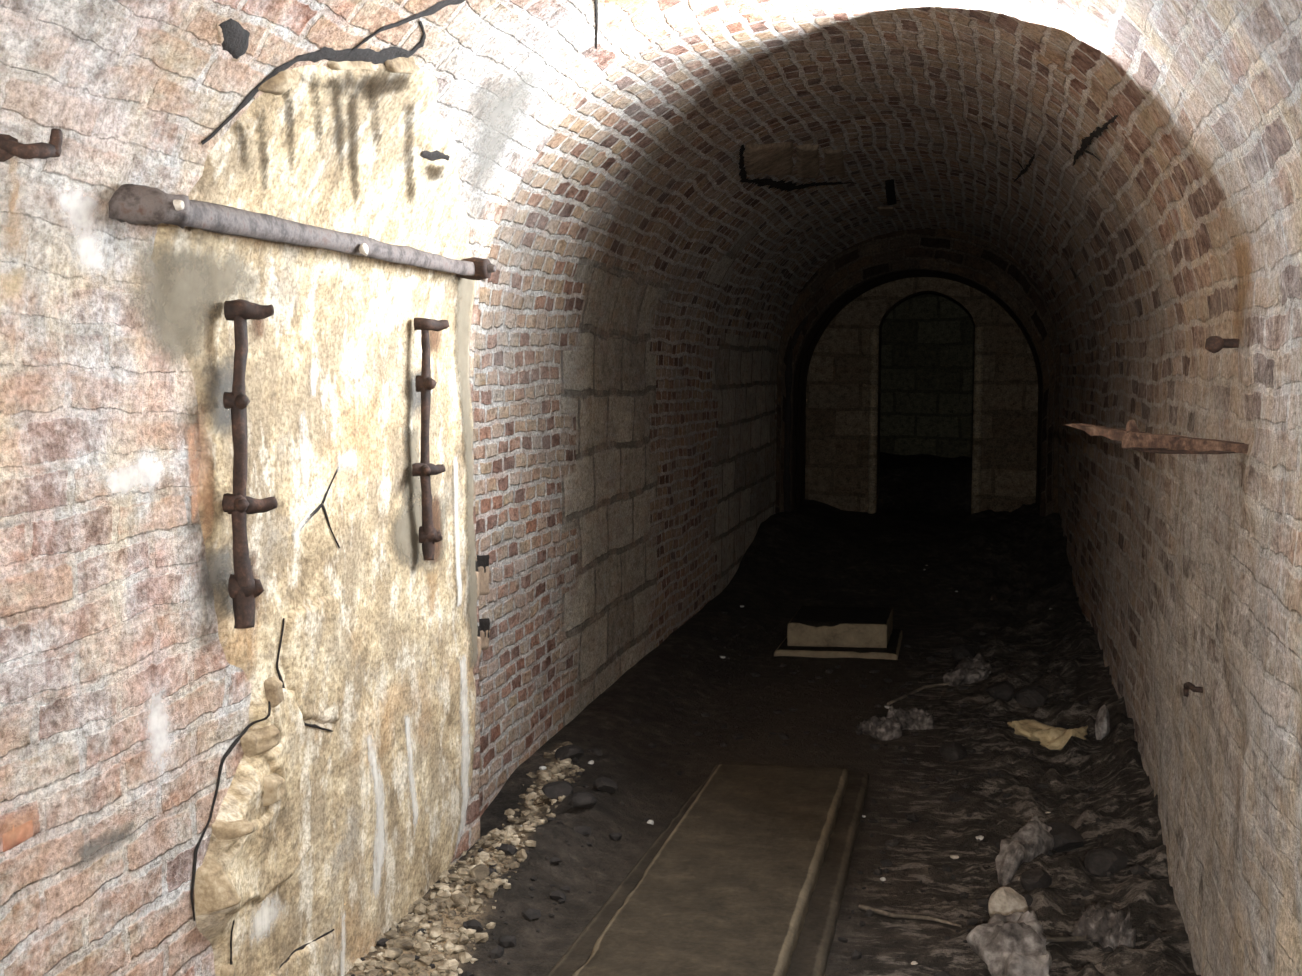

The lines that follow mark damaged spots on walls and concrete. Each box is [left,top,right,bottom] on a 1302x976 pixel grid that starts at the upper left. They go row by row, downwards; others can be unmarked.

hole [216,18,250,62]
crack [201,0,465,145]
crack [592,0,600,49]
leakage [236,114,269,188]
leakage [283,90,294,170]
leakage [313,74,408,198]
leakage [407,104,416,200]
rust [429,330,442,350]
rust [1064,420,1249,454]
crack [299,462,342,548]
rust [432,497,441,560]
peeling [190,676,312,921]